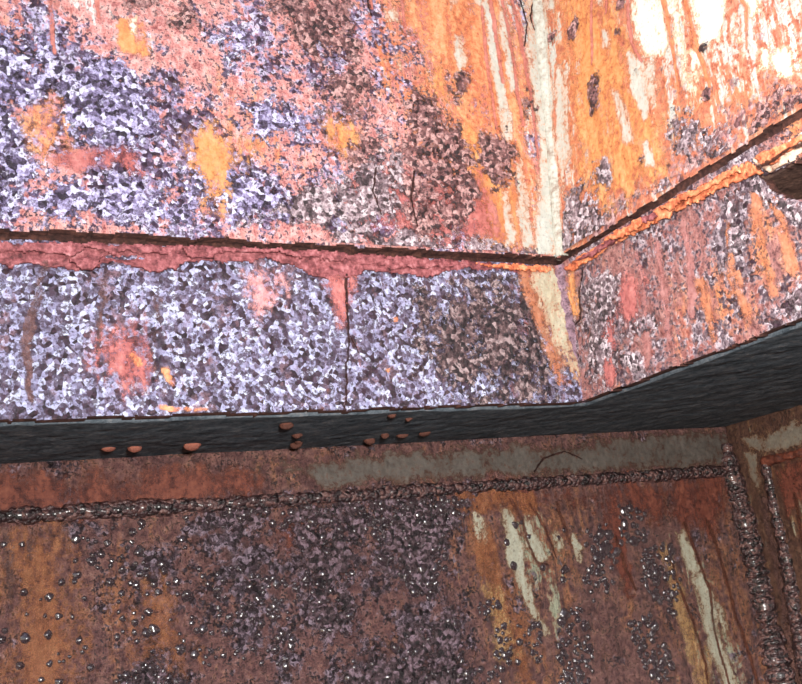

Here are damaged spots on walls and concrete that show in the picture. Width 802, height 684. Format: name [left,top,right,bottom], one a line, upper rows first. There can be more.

crack [519,0,535,46]
peeling [610,0,728,168]
peeling [756,44,802,79]
crack [371,167,382,215]
rust [0,0,802,402]
crack [409,171,418,227]
crack [756,142,802,170]
peeling [741,418,802,495]
peeling [471,511,488,544]
rust [0,463,759,684]
peeling [499,505,585,637]
peeling [675,529,738,684]